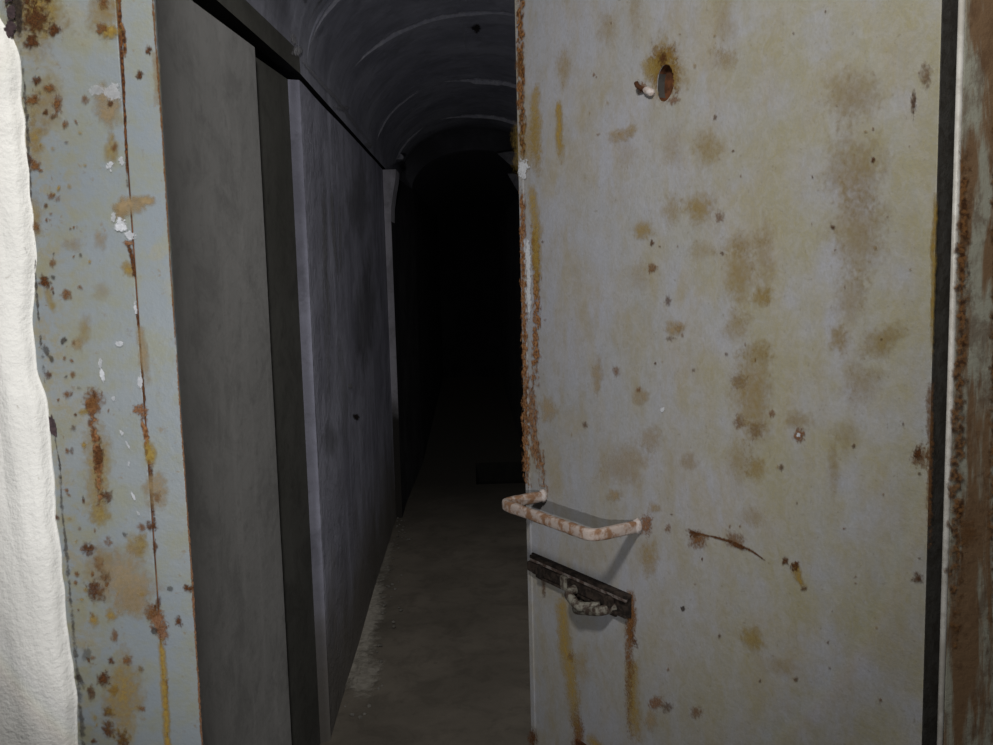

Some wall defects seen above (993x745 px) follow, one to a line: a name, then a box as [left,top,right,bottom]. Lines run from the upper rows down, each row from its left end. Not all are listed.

corrosion [10,0,61,48]
corrosion [26,77,77,128]
corrosion [97,0,142,173]
corrosion [516,0,541,160]
corrosion [38,253,81,299]
corrosion [518,190,553,493]
corrosion [944,160,969,593]
corrosion [74,390,111,520]
corrosion [133,404,166,531]
corrosion [80,544,118,600]
corrosion [87,658,144,745]
corrosion [146,599,181,745]